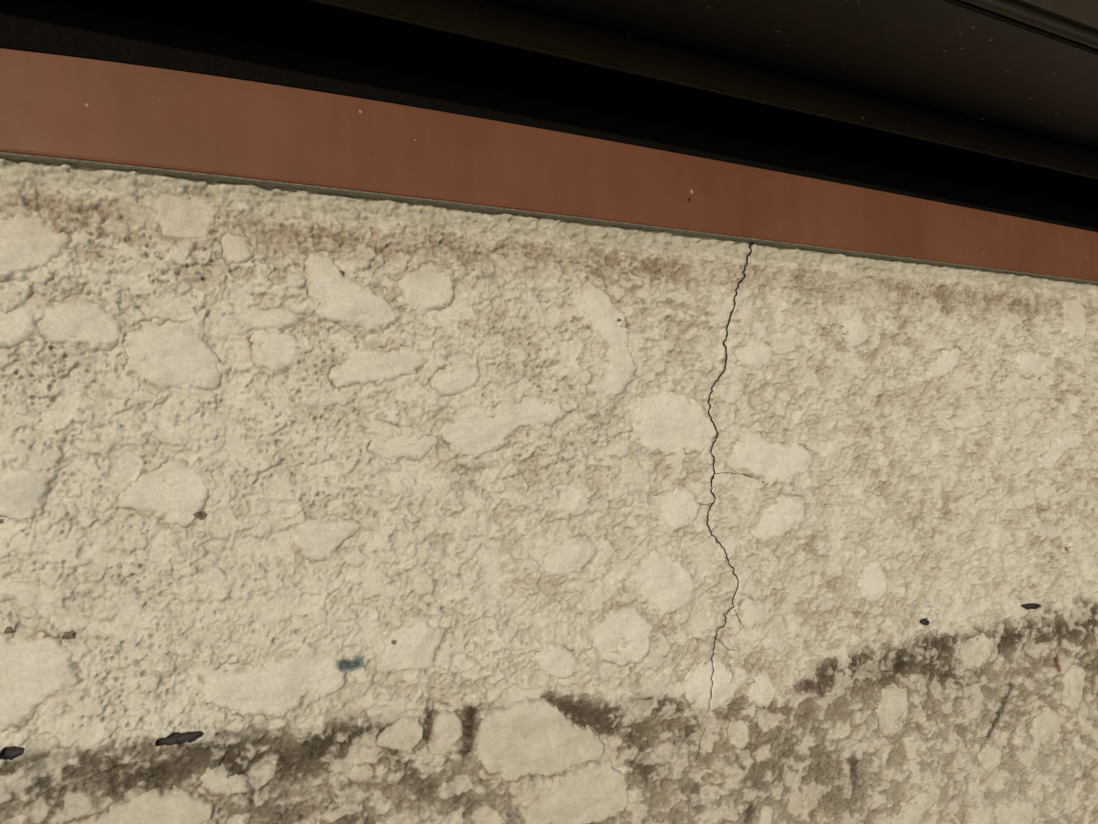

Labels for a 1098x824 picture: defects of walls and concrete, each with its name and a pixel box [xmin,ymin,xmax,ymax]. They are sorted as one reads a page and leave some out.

crack [698,243,753,755]